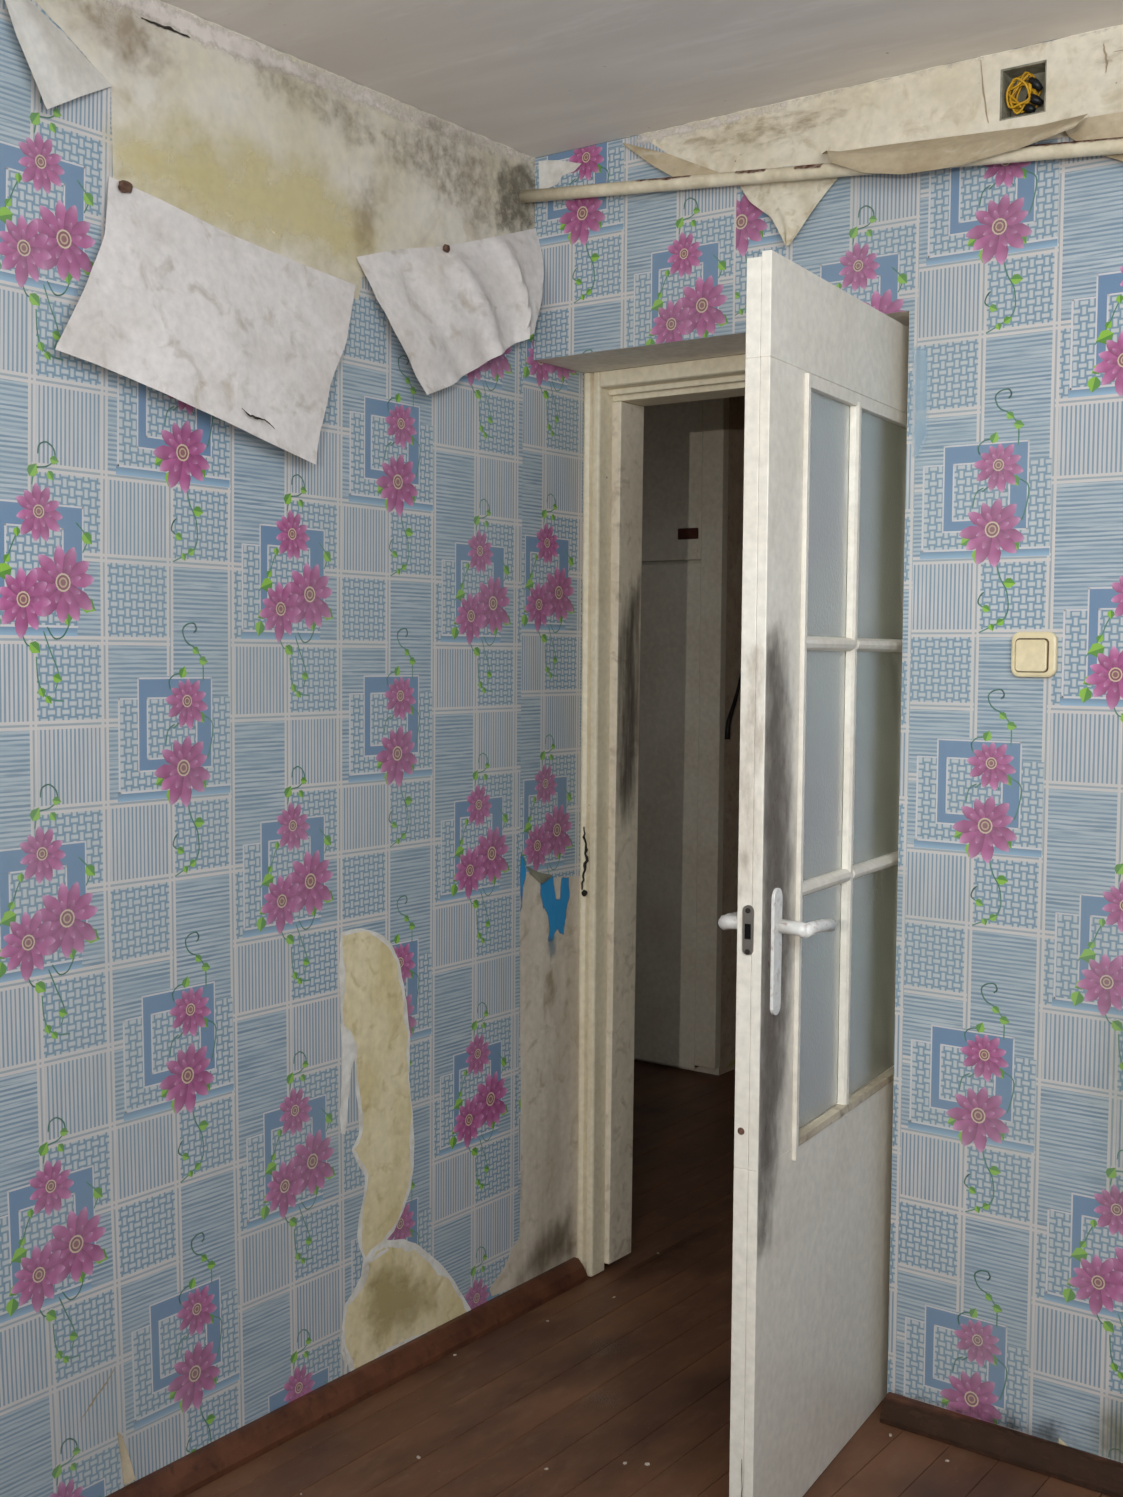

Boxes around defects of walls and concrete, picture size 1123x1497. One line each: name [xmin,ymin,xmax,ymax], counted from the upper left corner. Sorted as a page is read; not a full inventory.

flaking render [34,0,535,300]
mould [498,165,535,231]
flaking render [628,24,1123,173]
peeling [340,1023,356,1135]
flaking render [489,873,580,1296]